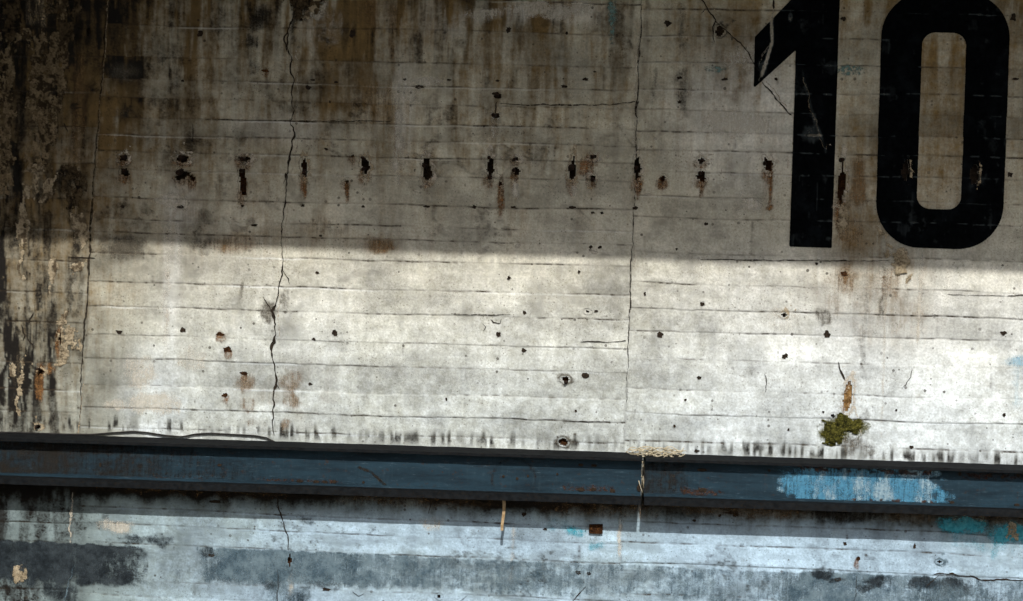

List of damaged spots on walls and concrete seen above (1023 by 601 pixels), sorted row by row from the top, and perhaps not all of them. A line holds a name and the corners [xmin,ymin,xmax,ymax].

water stain [246,5,271,47]
crack [700,0,824,147]
flaking render [0,0,91,296]
crack [218,2,391,434]
flaking render [7,310,83,416]